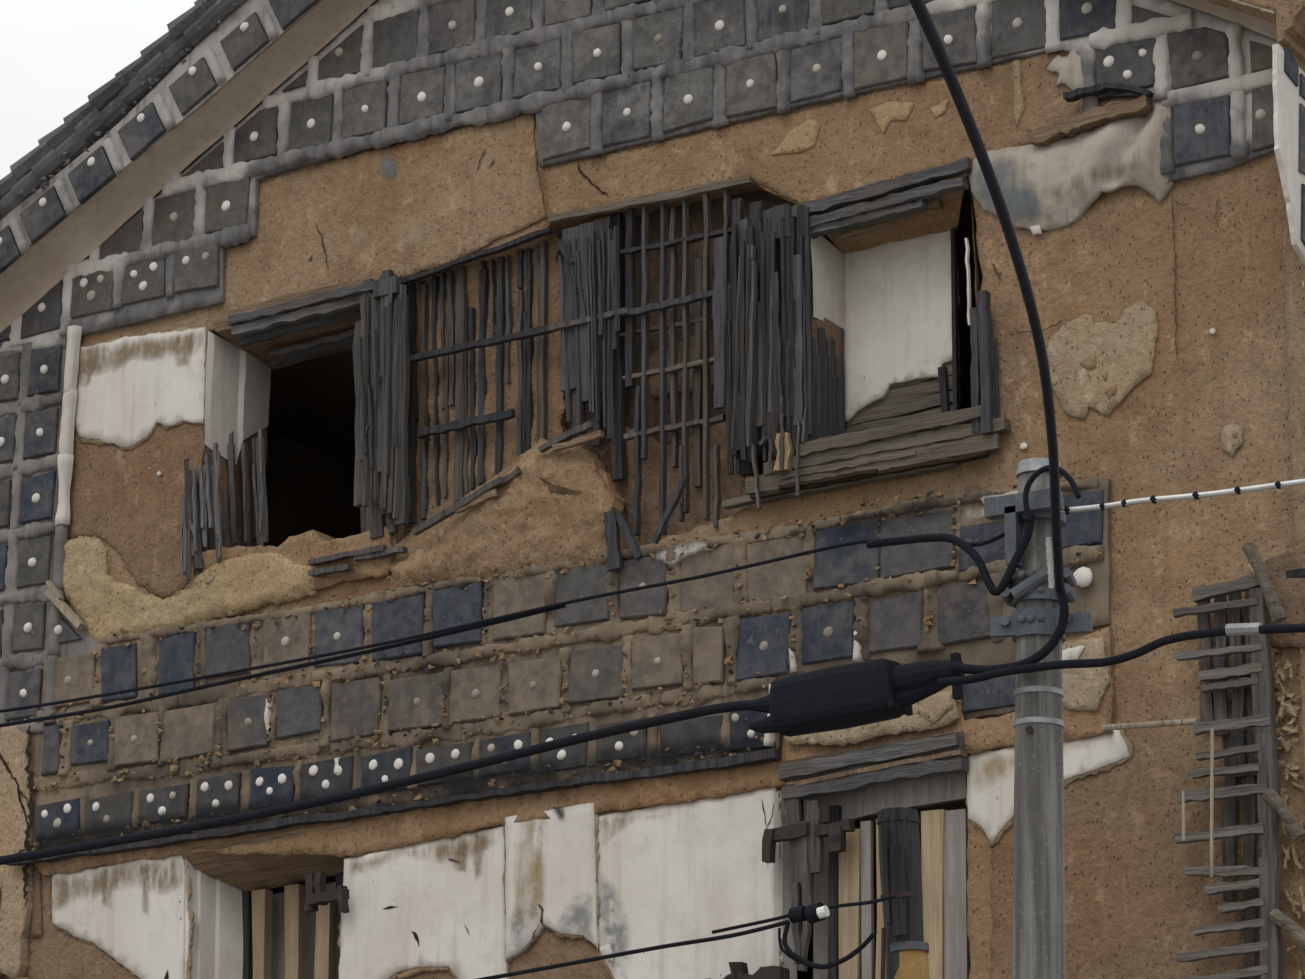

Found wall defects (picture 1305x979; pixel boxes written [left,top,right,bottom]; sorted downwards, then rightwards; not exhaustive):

crack [577,161,609,196]
damp [81,335,192,380]
spalling [1046,300,1159,419]
flaking render [67,423,205,599]
crack [0,723,35,908]
flaking render [25,867,140,979]
flaking render [396,966,454,979]
flaking render [509,927,614,979]